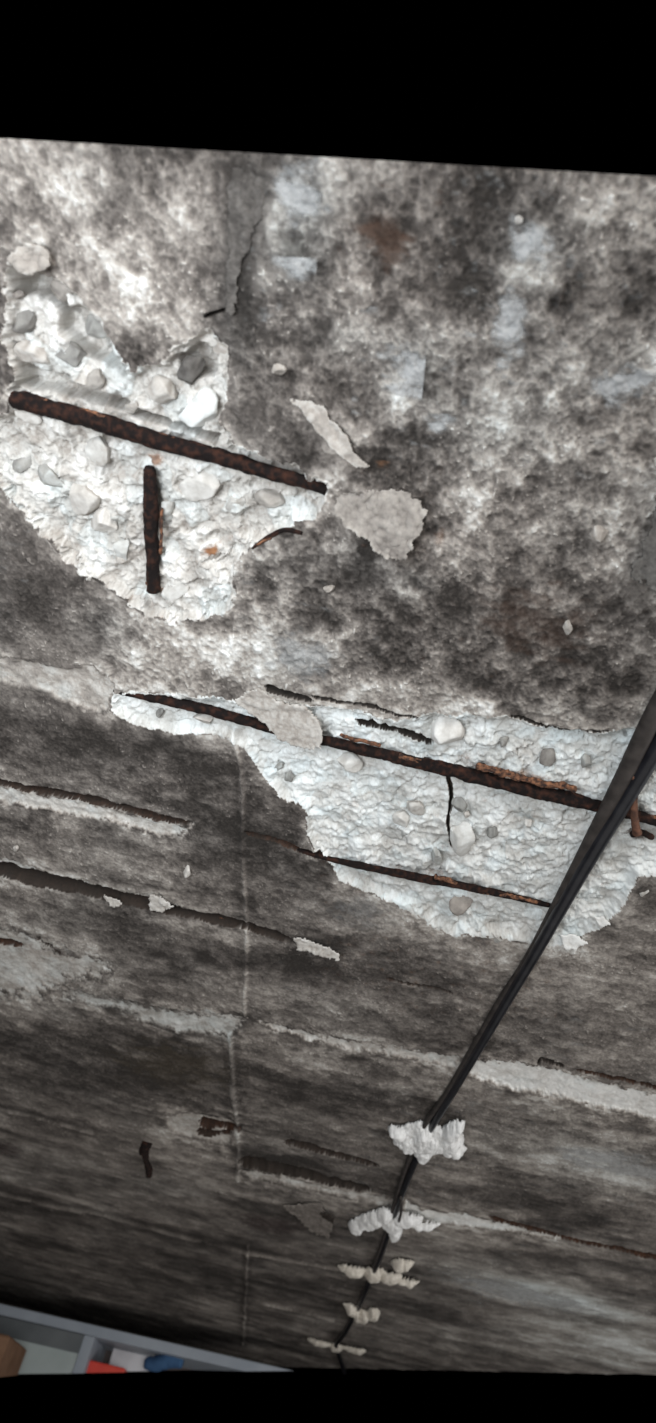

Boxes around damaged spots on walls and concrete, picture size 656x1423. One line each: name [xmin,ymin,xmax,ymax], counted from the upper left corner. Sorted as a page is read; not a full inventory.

spalling [0,242,428,628]
crack [0,779,194,826]
spalling [0,656,656,950]
crack [0,862,296,943]
crack [0,936,61,955]